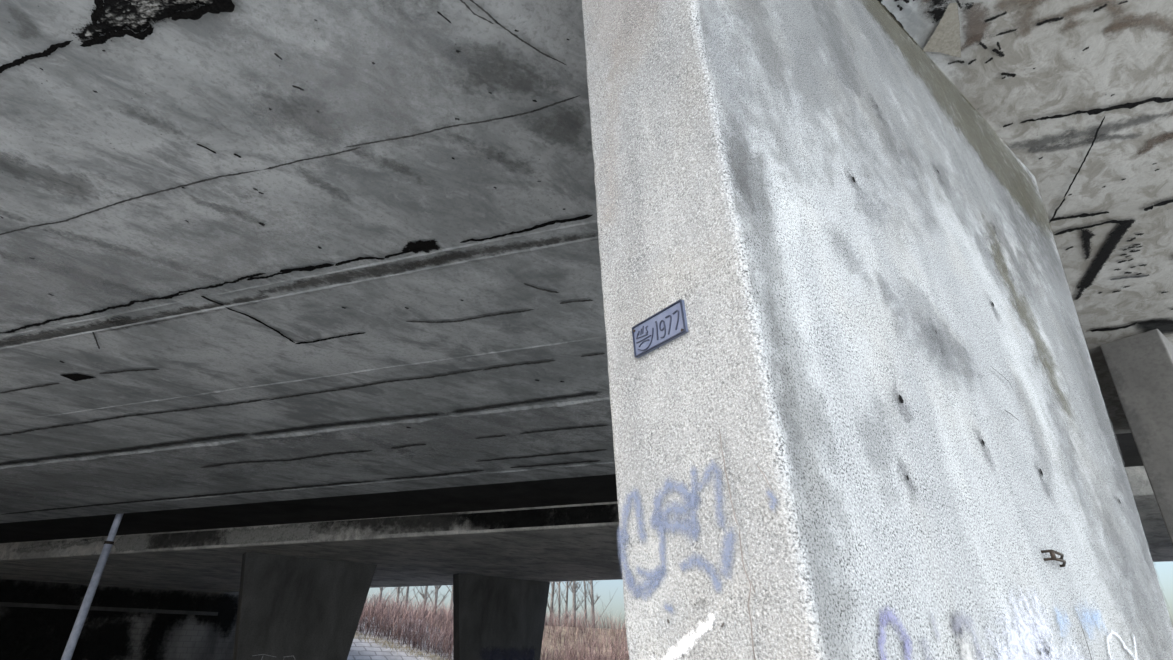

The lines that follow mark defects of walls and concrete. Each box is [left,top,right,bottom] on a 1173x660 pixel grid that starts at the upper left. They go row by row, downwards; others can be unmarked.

spalling [72,0,235,51]
crack [878,0,917,45]
crack [0,40,73,73]
crack [0,95,580,235]
crack [961,94,1173,235]
crack [460,214,592,243]
crack [1110,273,1149,281]
crack [0,248,421,374]
water stain [0,579,238,660]